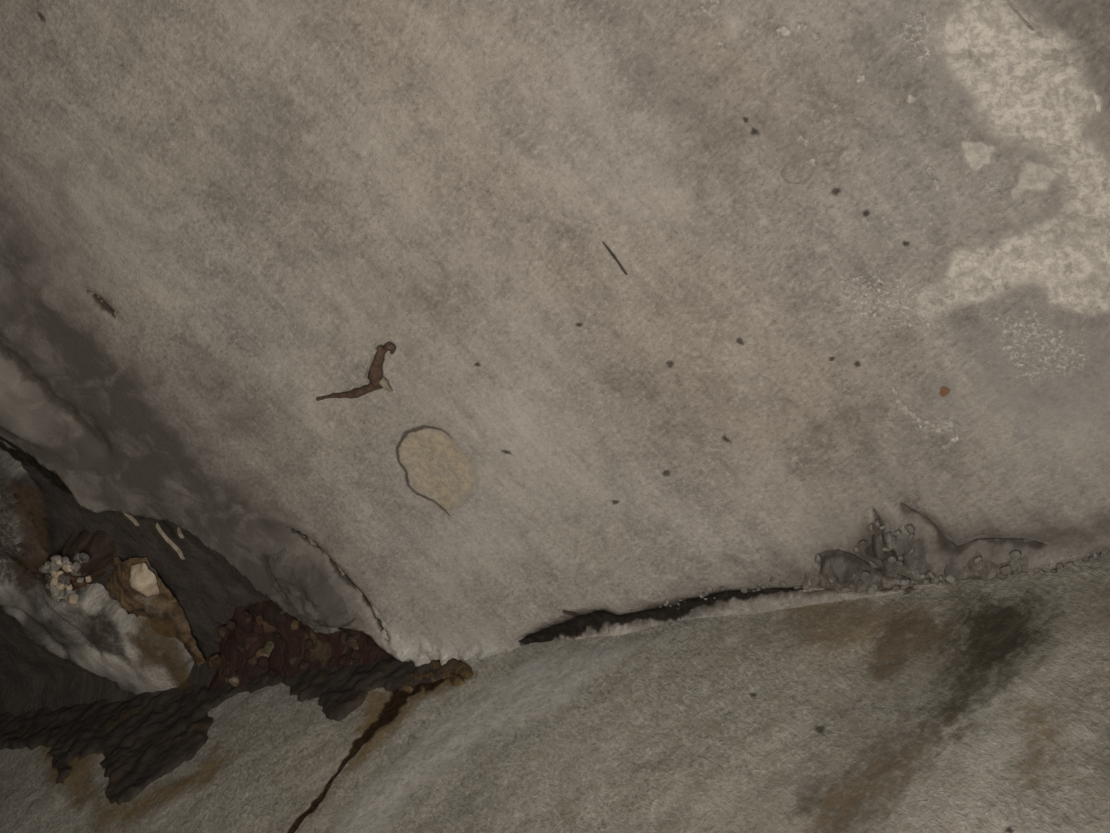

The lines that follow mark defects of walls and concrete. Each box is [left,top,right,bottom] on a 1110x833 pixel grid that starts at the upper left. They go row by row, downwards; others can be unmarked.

peeling [396,425,476,515]
spalling [0,462,462,805]
crack [519,577,829,644]
crack [1013,550,1110,575]
crack [288,677,449,833]
rust [355,660,474,763]
damp [799,595,1054,833]